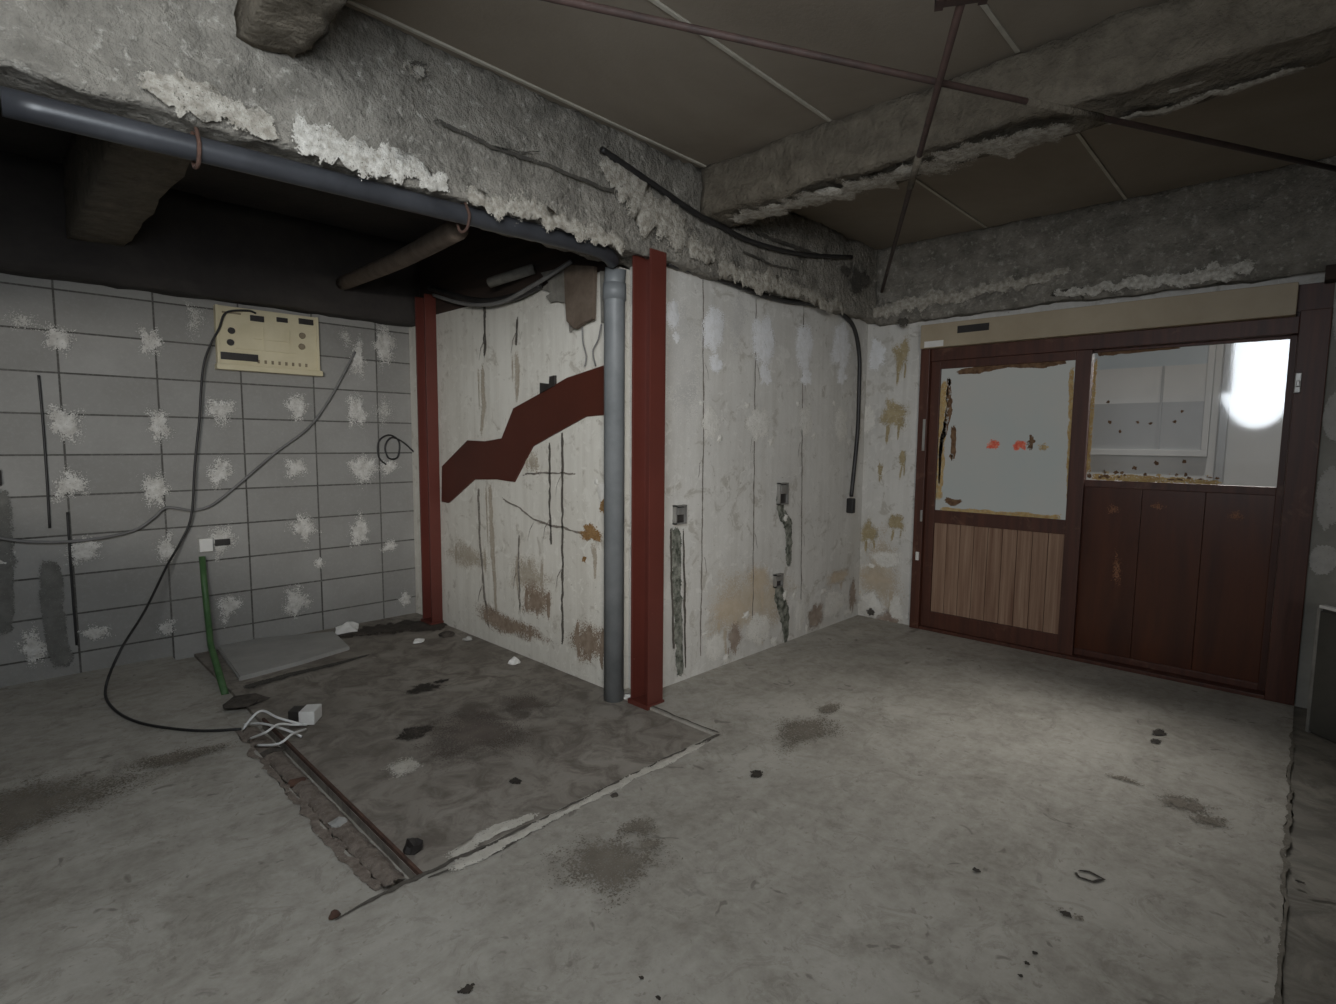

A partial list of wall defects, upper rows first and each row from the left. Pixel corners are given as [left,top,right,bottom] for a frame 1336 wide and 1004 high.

spalling [137,59,450,192]
spalling [466,155,871,317]
spalling [730,122,1080,225]
crack [1272,727,1296,1004]